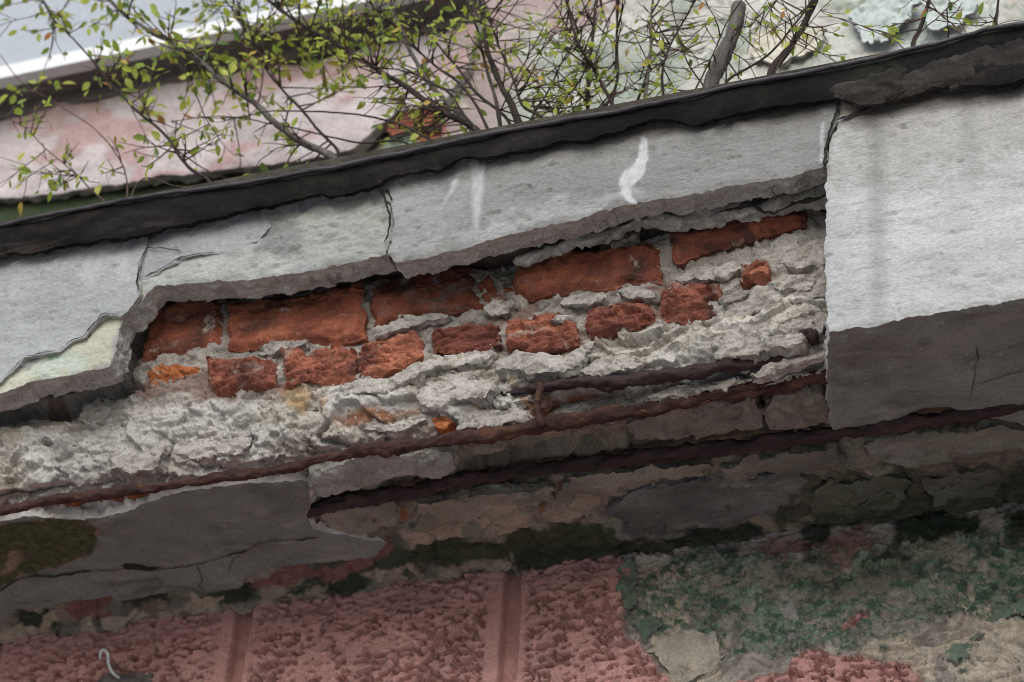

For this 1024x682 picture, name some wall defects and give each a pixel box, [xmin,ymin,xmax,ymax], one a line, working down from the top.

efflorescence [619,138,648,203]
crack [716,102,871,215]
crack [379,189,392,242]
corrosion [340,408,394,424]
spalling [0,183,1024,682]
corrosion [524,396,592,417]